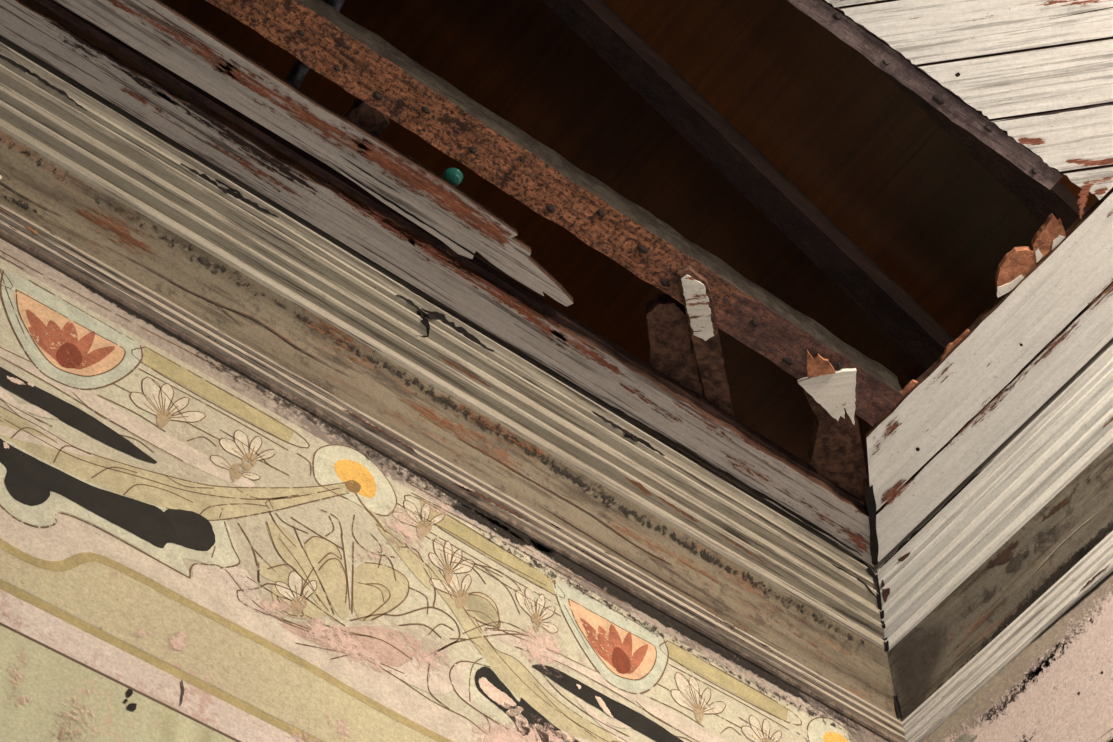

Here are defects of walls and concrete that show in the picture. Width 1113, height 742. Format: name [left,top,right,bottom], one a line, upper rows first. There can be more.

peeling [1018,137,1046,145]
peeling [1066,157,1113,219]
peeling [43,0,872,553]
peeling [943,278,1113,449]
rust [401,395,546,471]
crack [343,234,992,652]
peeling [871,418,902,456]
peeling [880,479,915,506]
peeling [988,540,1019,567]
peeling [512,621,568,671]
leakage [898,516,1113,725]
peeling [472,677,575,742]